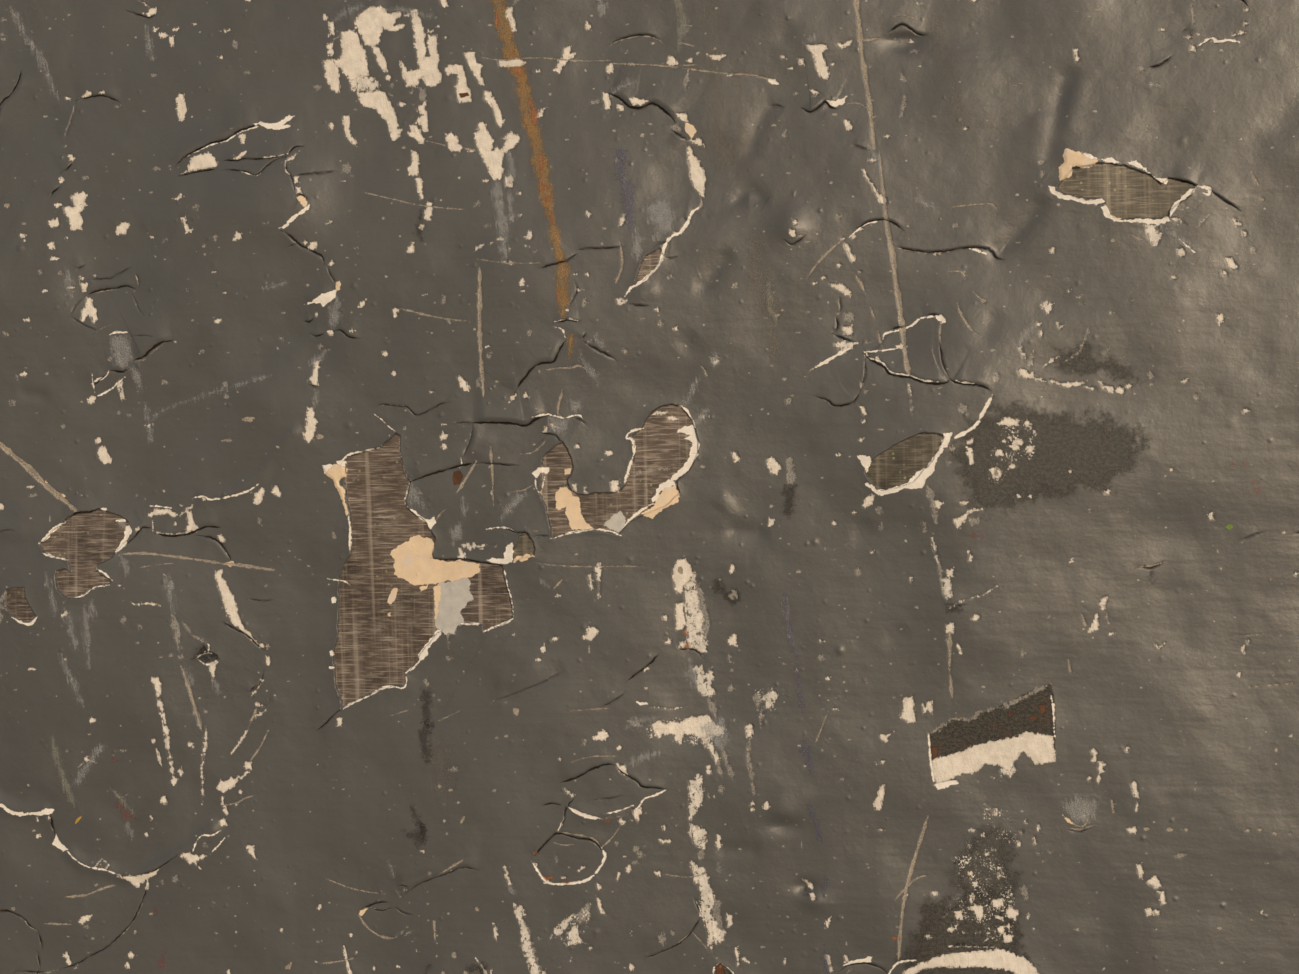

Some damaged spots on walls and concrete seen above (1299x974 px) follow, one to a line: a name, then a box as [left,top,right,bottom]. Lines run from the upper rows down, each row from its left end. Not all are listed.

crack [0,57,125,197]
crack [129,0,179,47]
peeling [314,0,537,253]
corrosion [490,0,570,319]
crack [809,182,1015,411]
peeling [1038,135,1256,257]
peeling [0,472,143,635]
peeling [319,345,711,752]
peeling [835,371,1036,655]
crack [491,644,559,701]
crack [540,611,719,847]
peeling [900,684,1056,790]